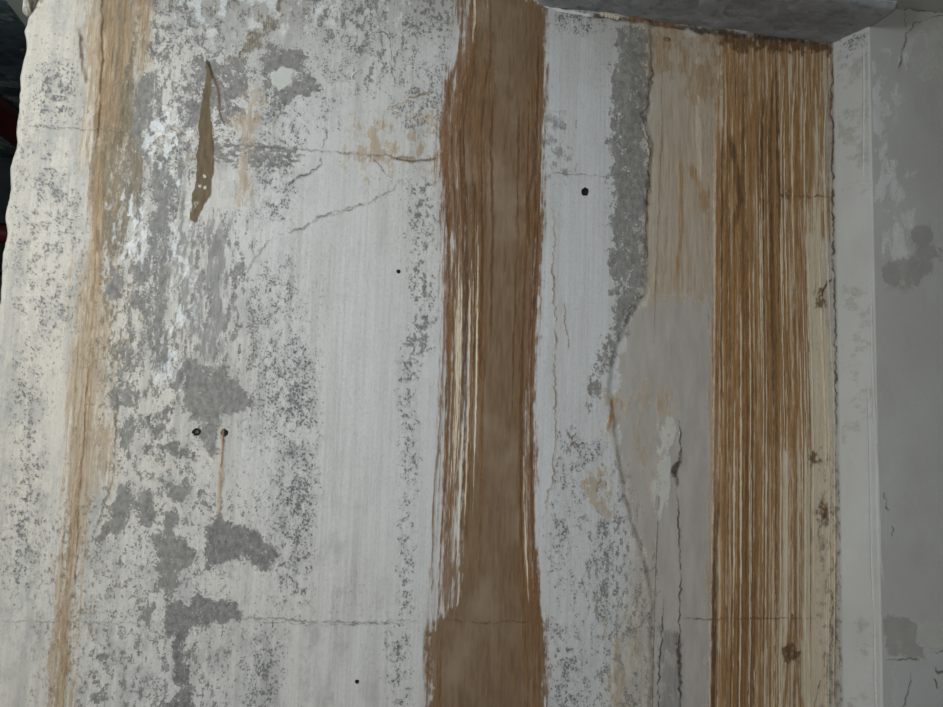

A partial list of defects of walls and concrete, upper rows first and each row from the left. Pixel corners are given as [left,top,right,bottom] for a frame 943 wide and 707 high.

crack [896,8,943,65]
leakage [144,112,182,165]
leakage [180,60,267,222]
leakage [349,113,437,177]
corrosion [47,0,154,707]
peeling [0,0,460,707]
corrosion [396,0,549,707]
corrosion [708,30,837,707]
crack [892,651,943,705]